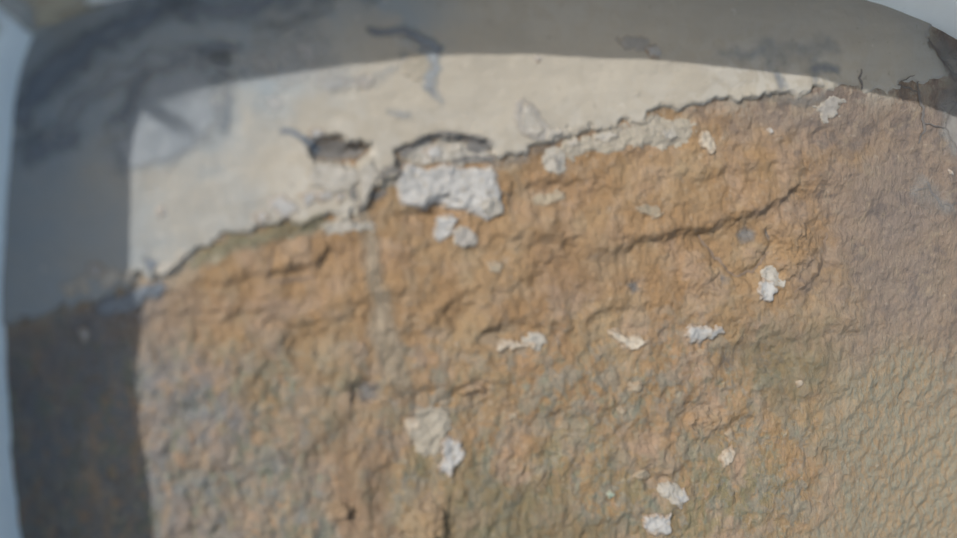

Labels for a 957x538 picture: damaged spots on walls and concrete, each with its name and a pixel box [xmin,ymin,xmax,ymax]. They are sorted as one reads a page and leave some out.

damp [13,0,312,172]
peeling [513,97,580,147]
spalling [698,130,716,155]
spalling [252,128,506,248]
flaking render [59,250,193,297]
spalling [756,265,786,302]
spalling [496,332,548,352]
spalling [607,327,649,351]
spalling [683,324,725,345]
spalling [403,406,466,477]
spalling [718,428,736,468]
spalling [631,469,690,537]